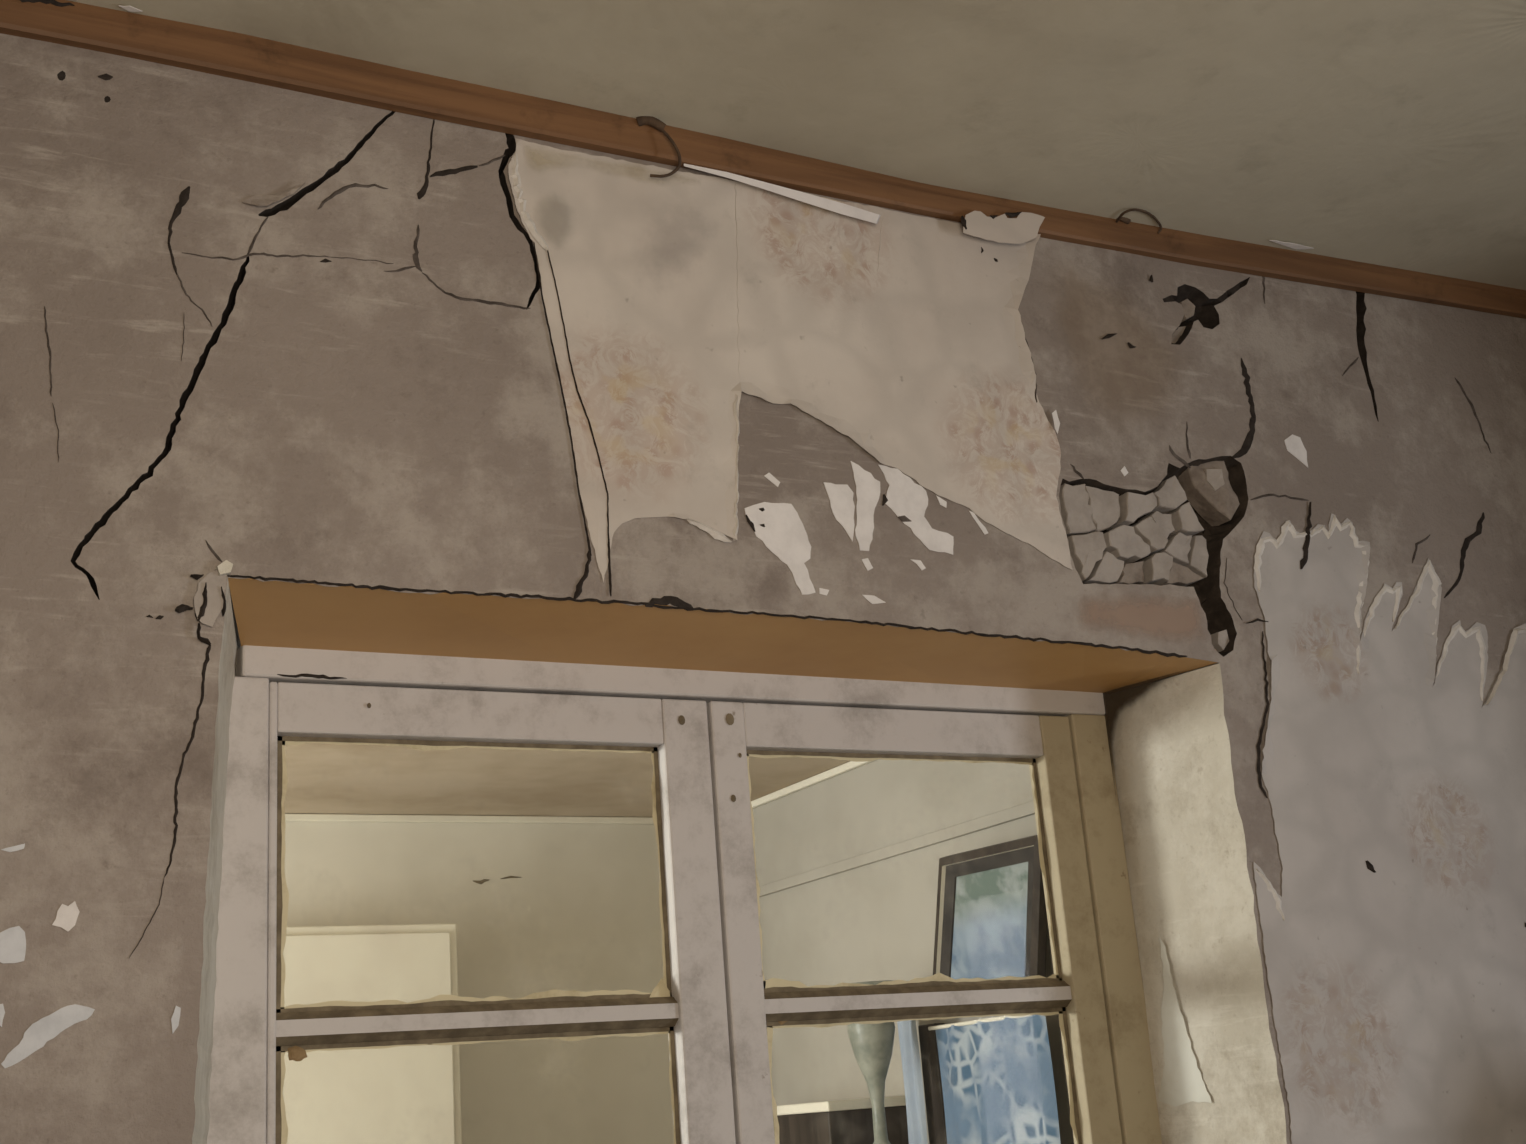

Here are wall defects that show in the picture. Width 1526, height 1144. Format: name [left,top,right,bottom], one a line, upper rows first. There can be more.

crack [71,111,1187,658]
peeling [1052,410,1060,434]
peeling [744,473,829,596]
peeling [823,461,954,571]
peeling [969,511,988,535]
crack [129,644,211,958]
peeling [0,926,26,964]
peeling [52,901,79,931]
peeling [1,1004,95,1068]